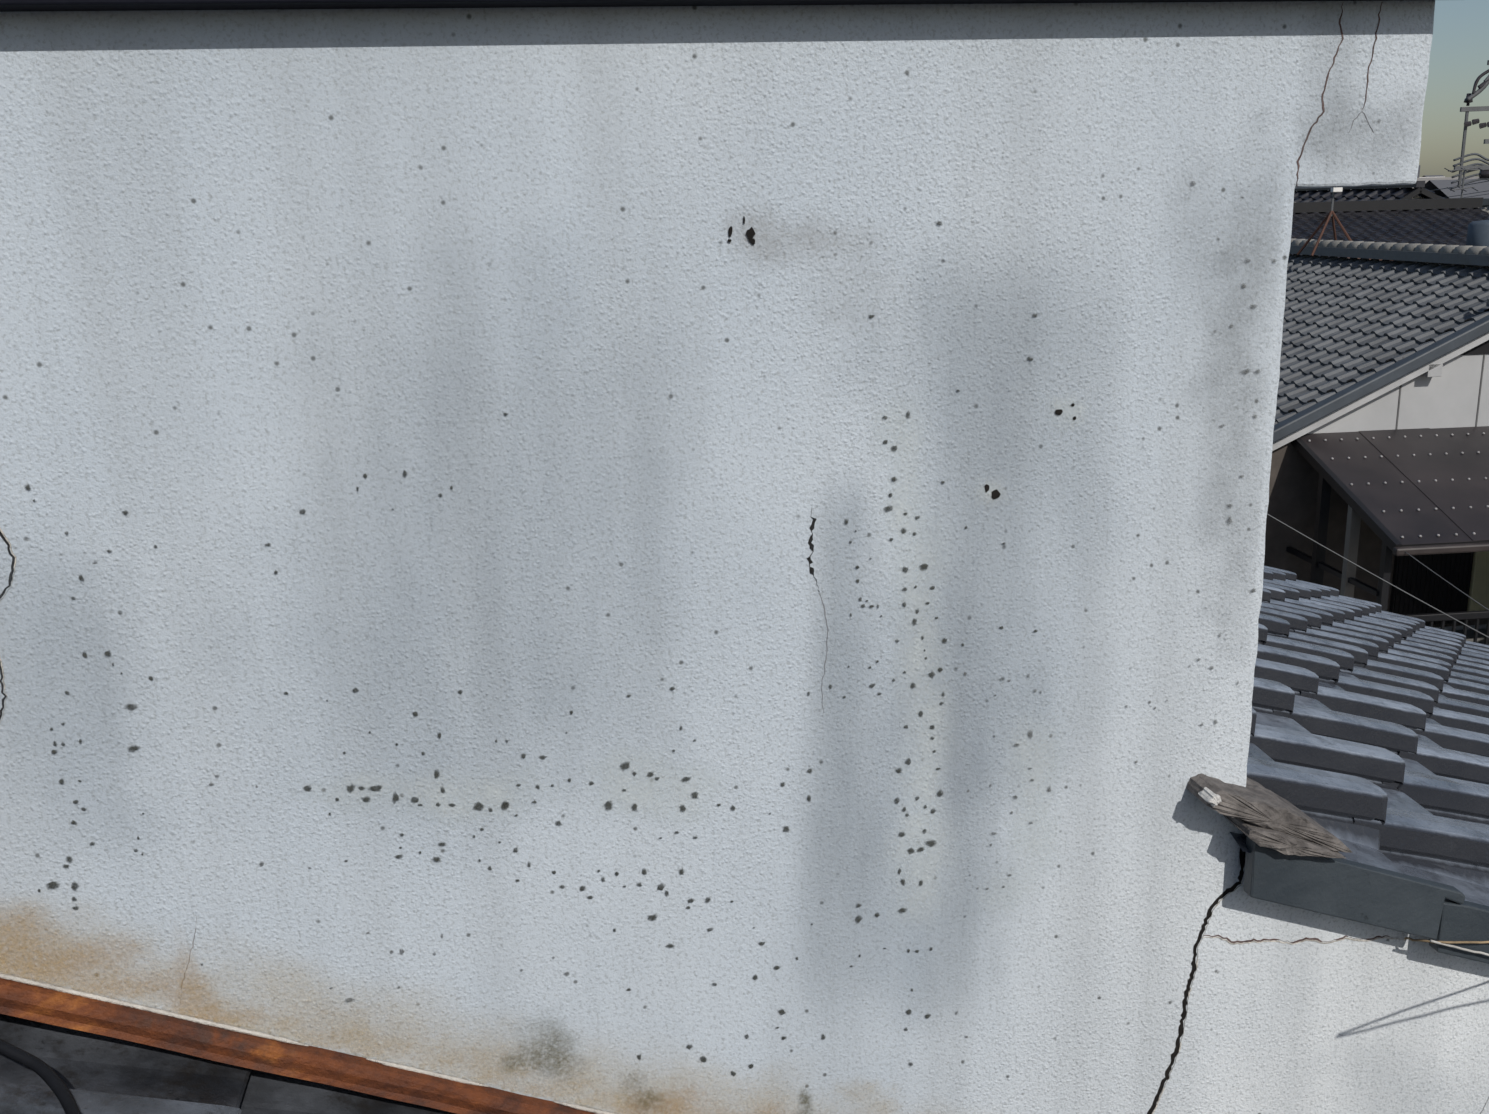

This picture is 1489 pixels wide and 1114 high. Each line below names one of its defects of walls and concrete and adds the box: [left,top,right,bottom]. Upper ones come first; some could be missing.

crack [1296,3,1382,187]
crack [0,528,17,598]
crack [807,508,829,713]
damp [869,564,943,695]
crack [0,657,8,723]
damp [329,771,455,815]
damp [474,802,518,816]
damp [605,763,659,810]
damp [895,784,943,886]
damp [38,857,78,910]
damp [552,869,669,899]
crack [1147,848,1405,1114]